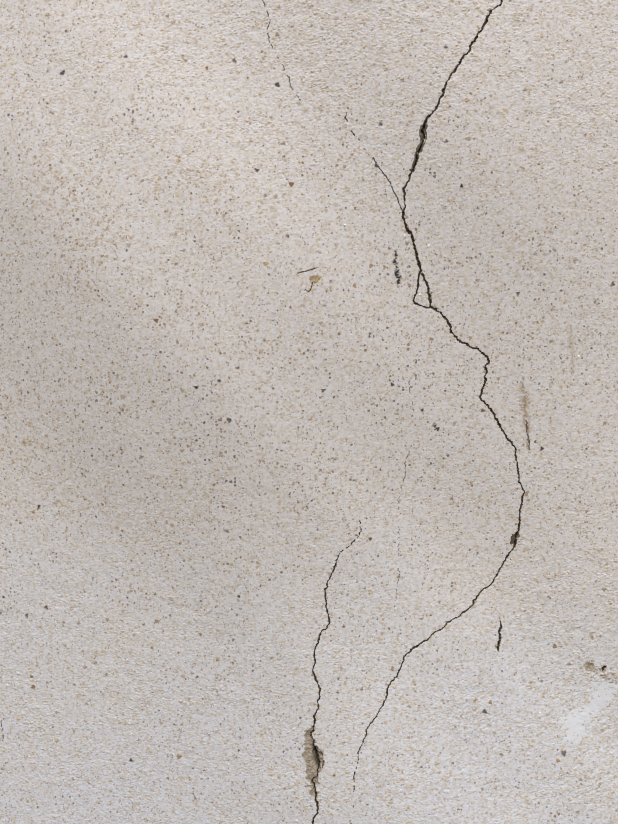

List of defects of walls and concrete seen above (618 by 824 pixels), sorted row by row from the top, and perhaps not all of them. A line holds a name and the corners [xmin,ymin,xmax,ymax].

crack [310,522,361,824]
crack [353,0,525,787]